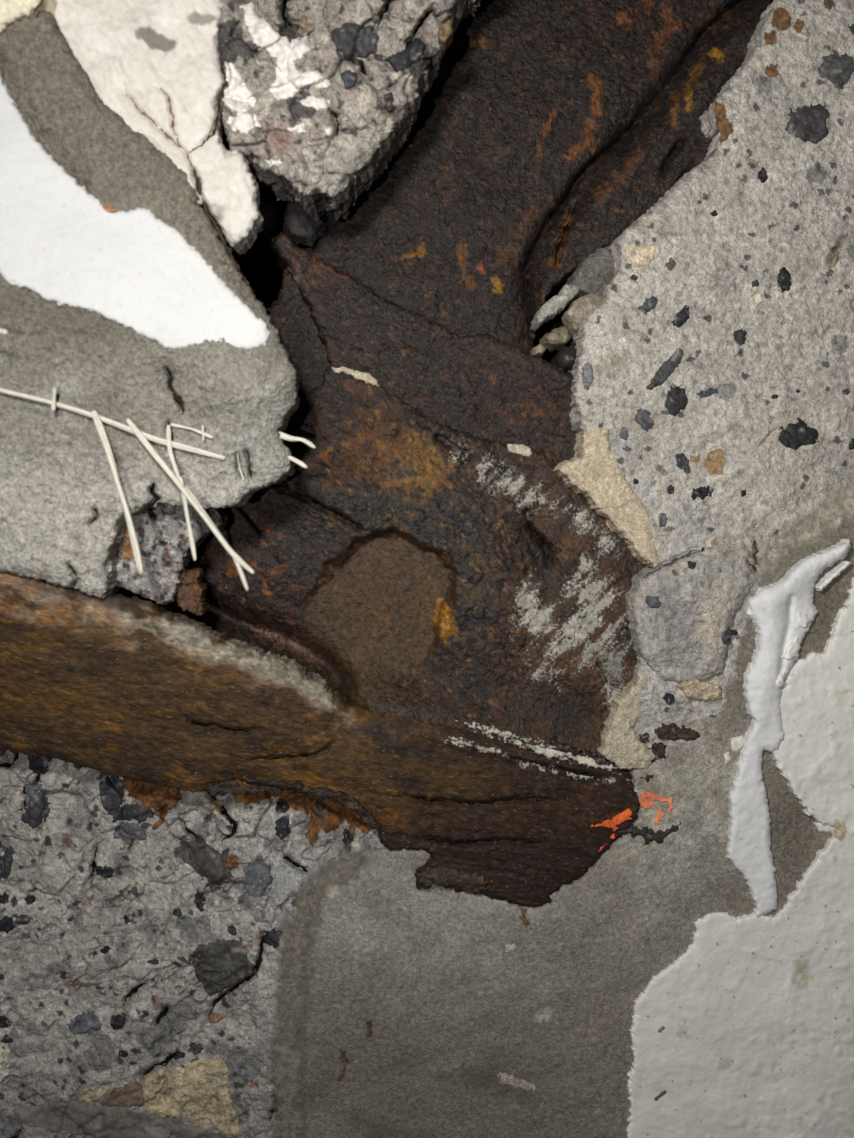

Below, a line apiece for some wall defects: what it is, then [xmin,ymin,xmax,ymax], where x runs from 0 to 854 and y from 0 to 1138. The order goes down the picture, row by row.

spalling [0,0,482,255]
peeling [0,64,271,350]
rust [121,524,141,560]
spalling [567,0,854,1138]
rust [122,778,182,830]
crack [181,784,238,841]
rust [233,789,372,845]
damp [326,885,343,900]
spalling [0,750,386,1138]
crack [122,983,146,1008]
crack [208,931,265,1016]
damp [533,1006,555,1023]